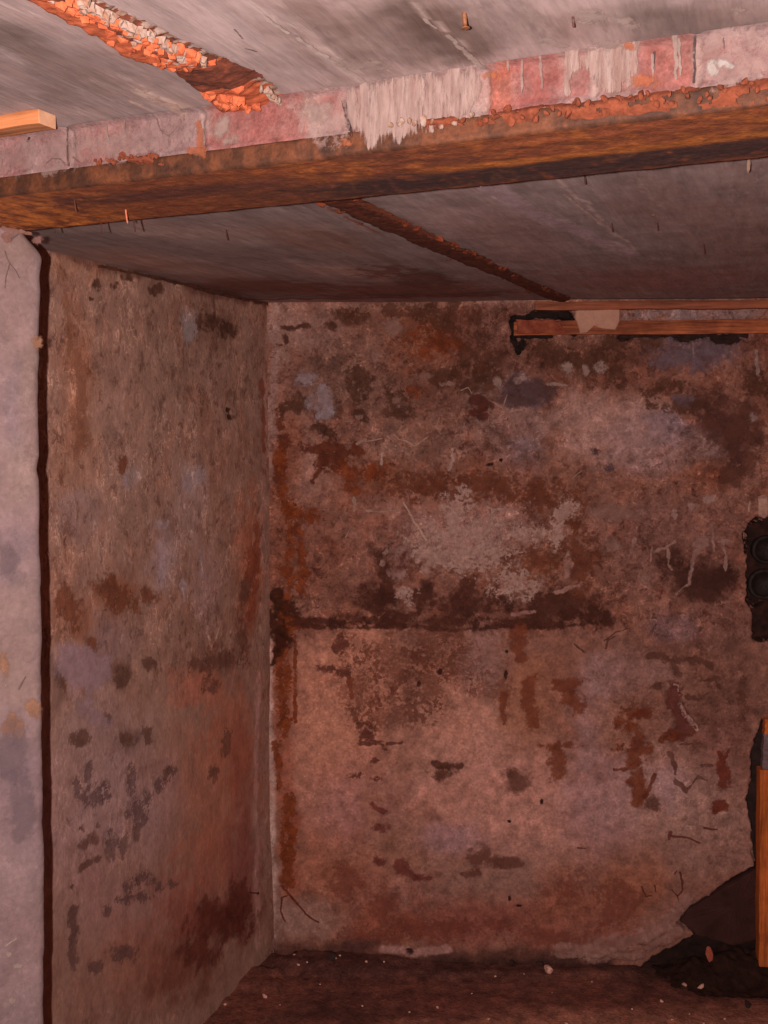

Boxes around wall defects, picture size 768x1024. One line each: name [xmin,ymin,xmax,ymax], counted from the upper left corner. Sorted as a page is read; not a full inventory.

leakage [264,16,485,150]
leakage [539,10,640,97]
leakage [672,35,682,80]
corrosion [187,120,207,158]
corrosion [353,198,515,277]
leakage [288,484,645,678]
corrosion [244,379,601,889]
leakage [350,720,403,781]